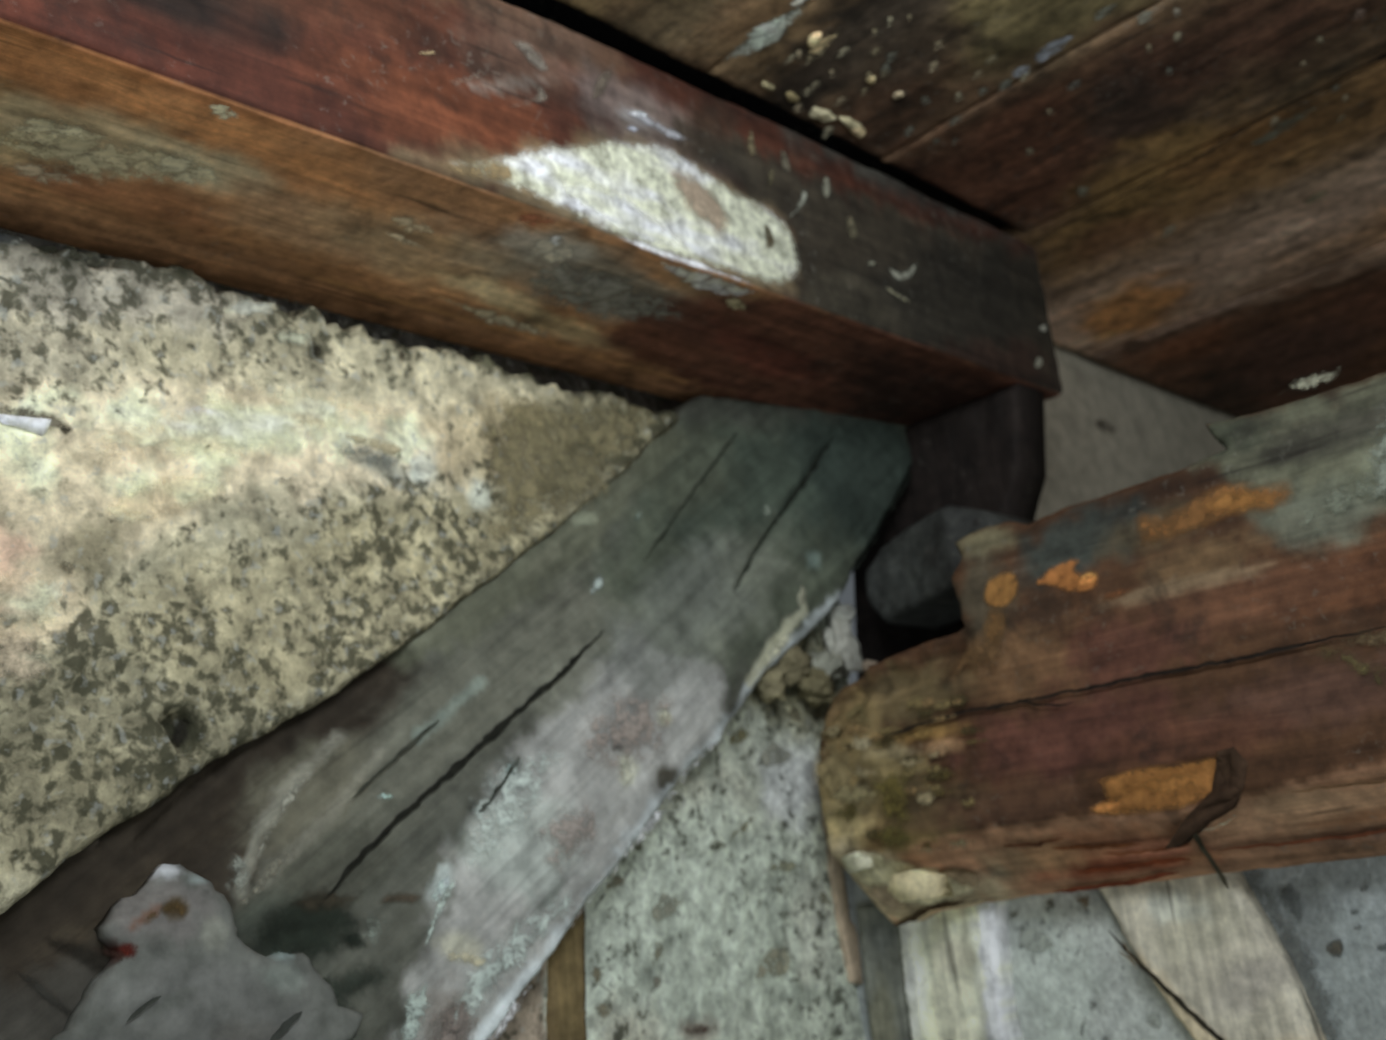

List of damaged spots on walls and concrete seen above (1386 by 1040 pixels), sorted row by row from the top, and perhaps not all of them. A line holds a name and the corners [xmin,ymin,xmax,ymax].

damp [0,119,219,184]
damp [211,105,235,119]
damp [389,218,433,246]
damp [448,300,546,334]
damp [519,214,680,320]
damp [665,266,754,309]
crack [644,429,740,561]
crack [734,437,833,591]
crack [850,470,912,574]
crack [819,626,1386,758]
crack [325,630,603,899]